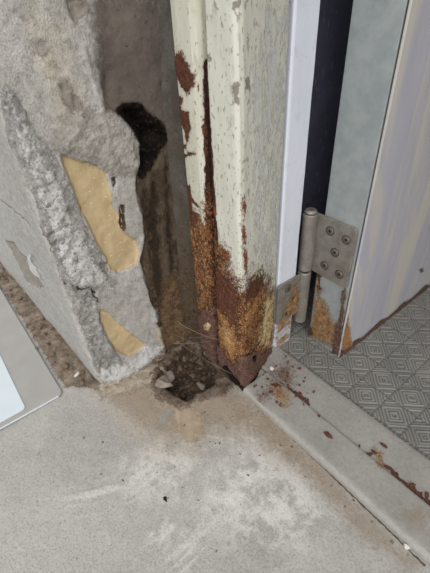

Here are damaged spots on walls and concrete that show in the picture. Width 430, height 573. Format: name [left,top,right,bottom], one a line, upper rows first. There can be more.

spalling [59,76,83,111]
leakage [92,0,165,126]
spalling [116,102,168,179]
spalling [0,83,145,380]
leakage [136,143,190,339]
corrosion [174,50,315,408]
corrosion [309,274,430,358]
corrosion [366,442,430,506]